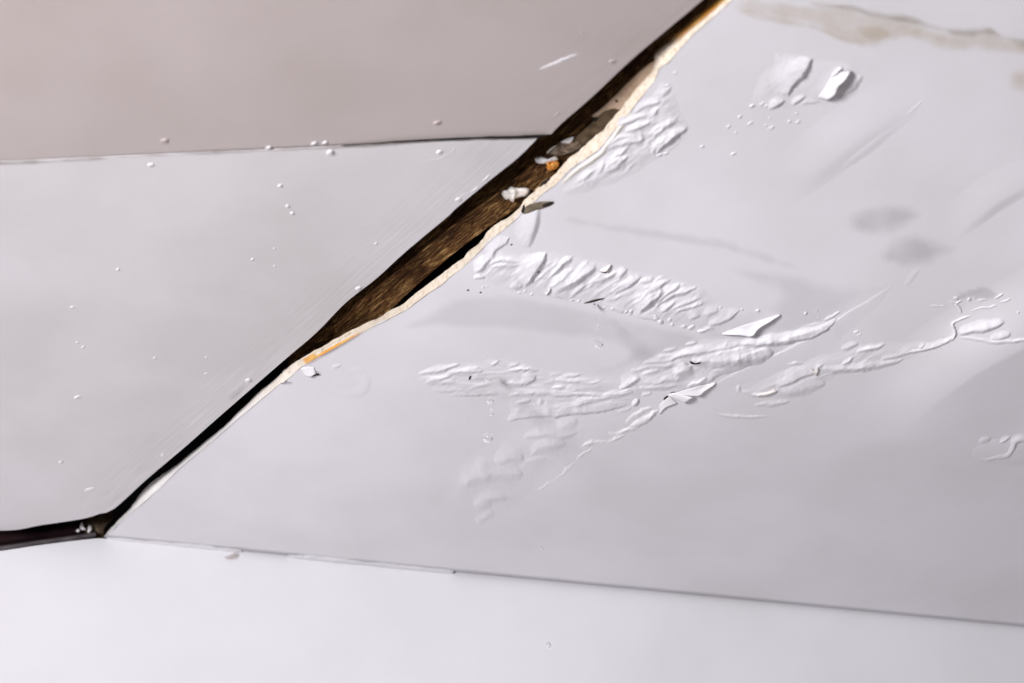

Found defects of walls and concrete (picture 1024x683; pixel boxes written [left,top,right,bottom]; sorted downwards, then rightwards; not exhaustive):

peeling [726,52,863,134]
crack [342,134,549,161]
peeling [619,311,841,429]